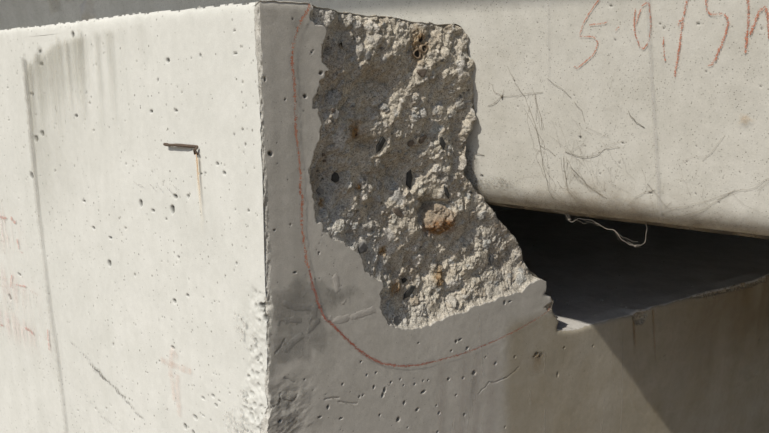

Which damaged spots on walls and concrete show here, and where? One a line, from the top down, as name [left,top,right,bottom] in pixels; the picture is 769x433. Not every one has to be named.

spalling [308,7,540,329]